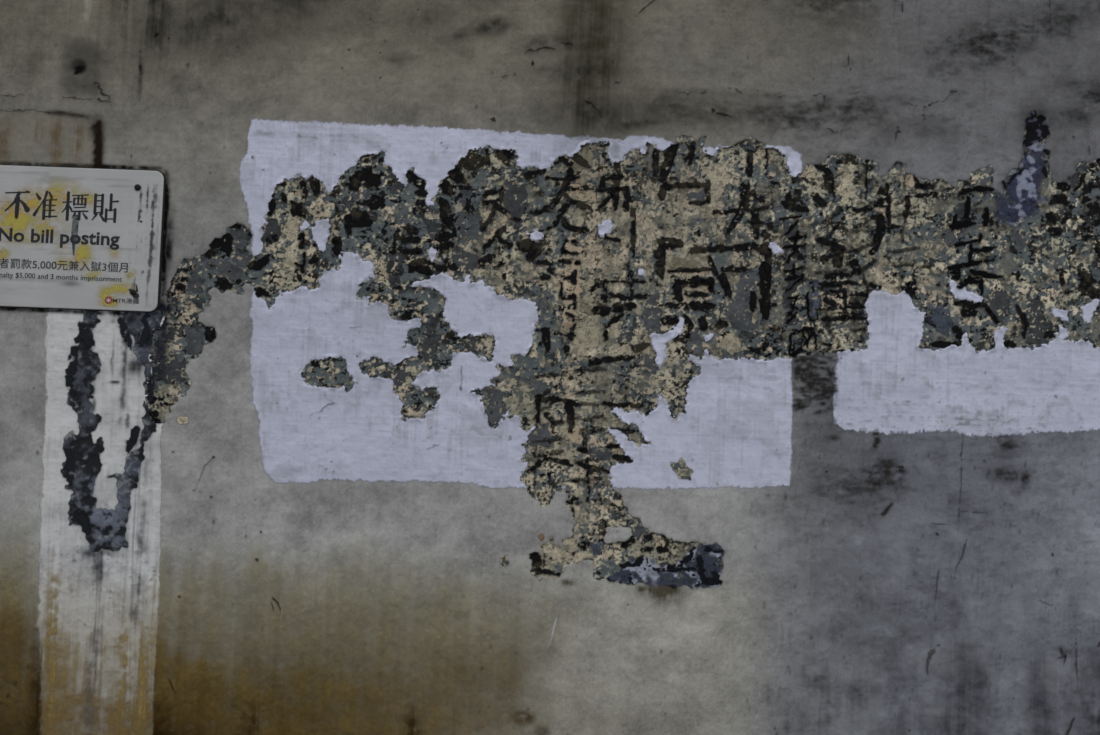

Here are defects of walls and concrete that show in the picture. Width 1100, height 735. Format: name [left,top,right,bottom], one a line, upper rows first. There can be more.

damp [567,0,611,127]
peeling [146,110,1100,588]